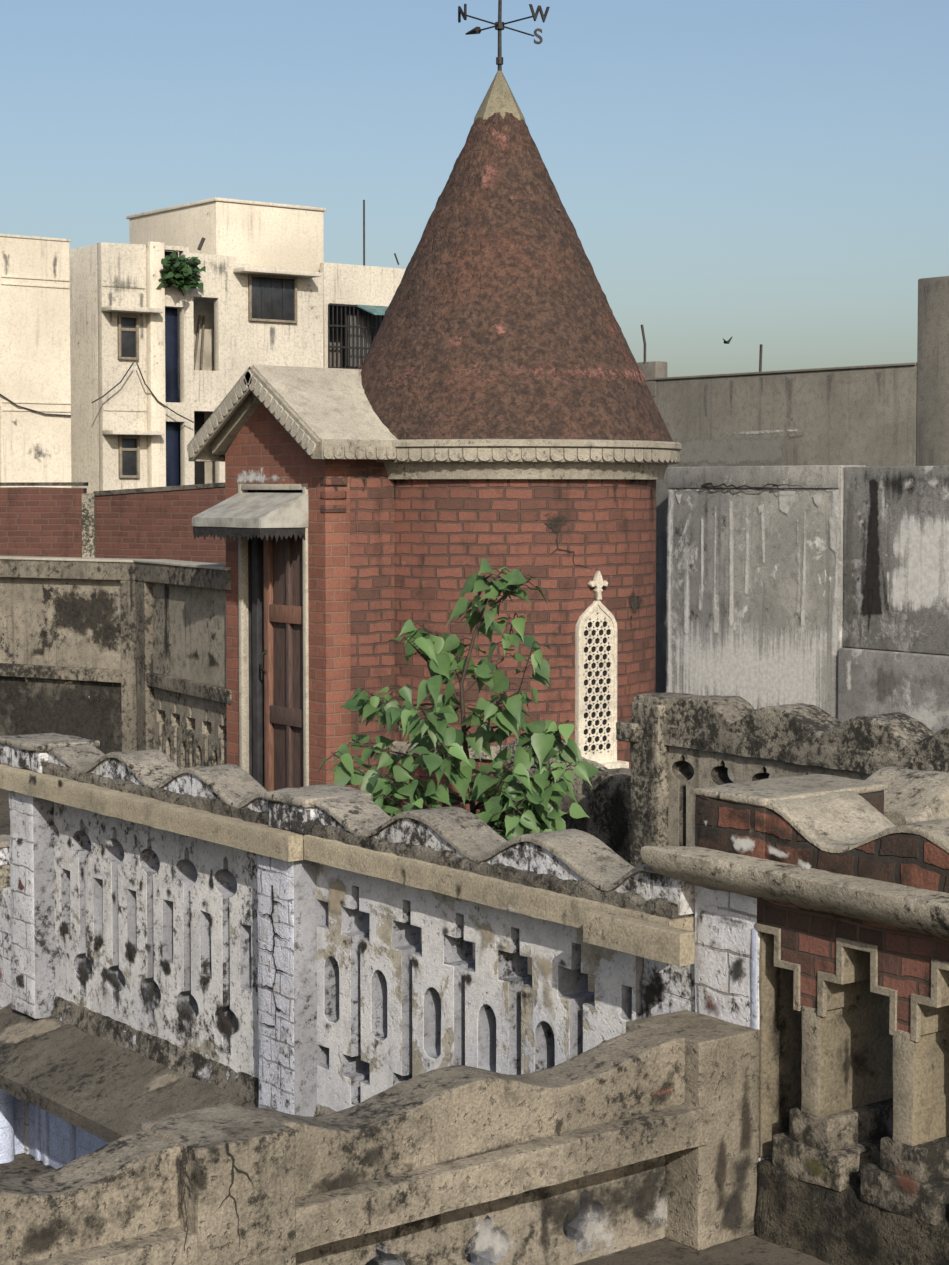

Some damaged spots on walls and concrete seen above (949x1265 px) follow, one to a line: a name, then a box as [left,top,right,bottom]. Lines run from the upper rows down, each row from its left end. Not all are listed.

leakage [33,567,136,655]
leakage [675,501,833,711]
leakage [847,473,949,630]
crack [257,885,290,1044]
crack [181,1142,255,1252]